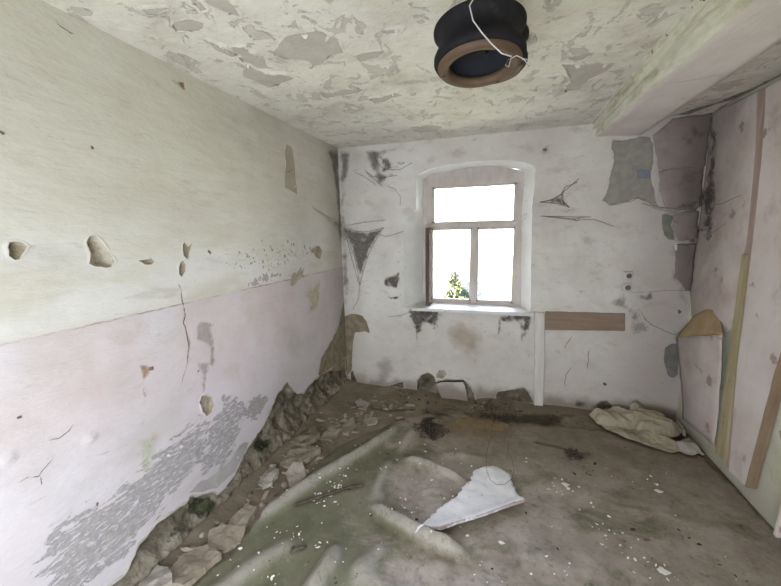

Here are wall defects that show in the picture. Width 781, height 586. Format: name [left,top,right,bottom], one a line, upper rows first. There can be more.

peeling [137,0,388,88]
peeling [560,52,617,93]
peeling [600,134,677,250]
spalling [2,239,32,262]
spalling [83,234,118,269]
spalling [176,241,193,277]
peeling [206,240,322,289]
crack [179,285,189,381]
water stain [409,311,438,332]
water stain [501,316,530,330]
peeling [664,344,678,377]
spalling [31,357,358,586]